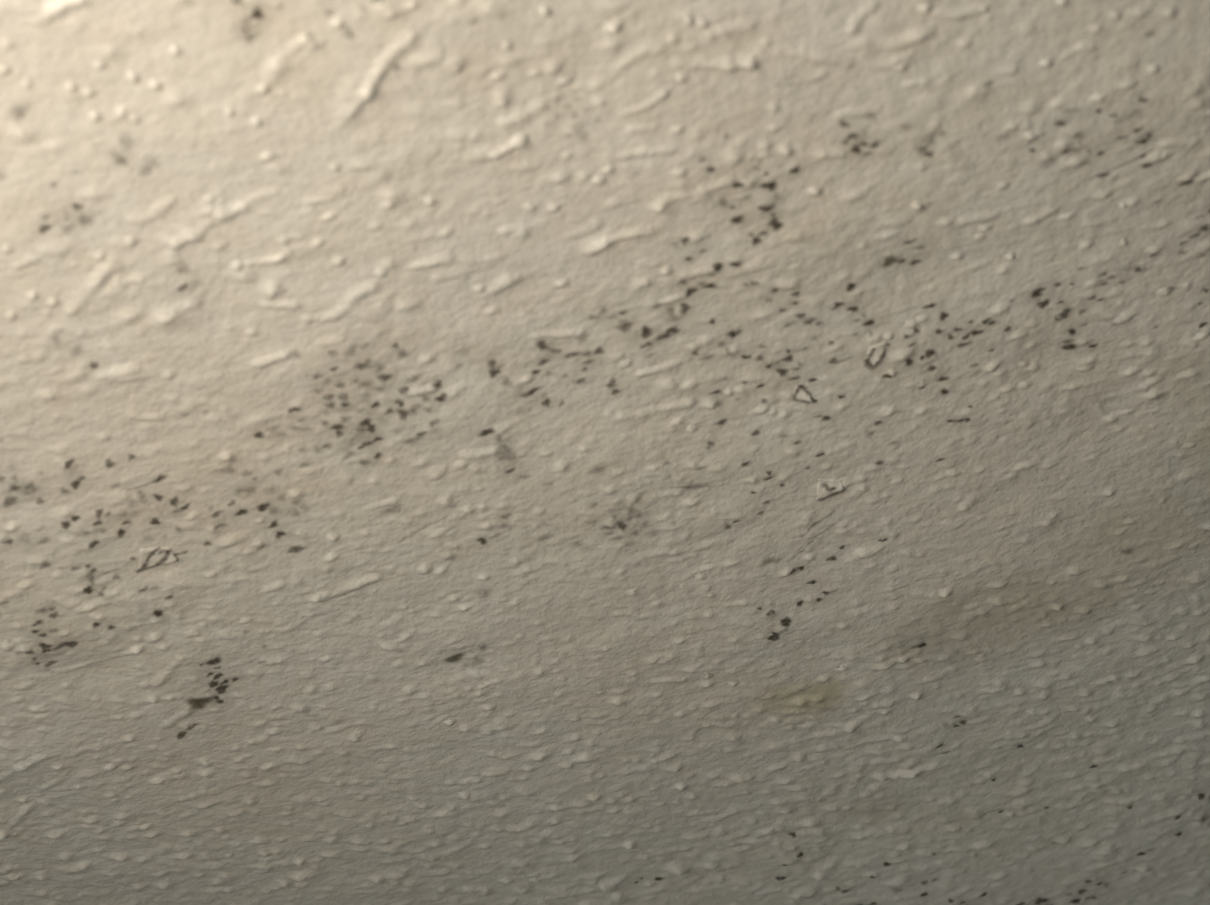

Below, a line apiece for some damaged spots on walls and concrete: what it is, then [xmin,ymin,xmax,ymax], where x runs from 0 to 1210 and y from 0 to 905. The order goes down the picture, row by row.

leakage [751,206,782,245]
leakage [681,263,739,312]
leakage [620,312,678,348]
leakage [923,304,1010,347]
leakage [1032,283,1097,350]
leakage [524,342,601,405]
leakage [905,328,948,394]
leakage [359,388,407,464]
leakage [230,504,284,537]
leakage [26,614,76,666]
leakage [758,608,790,641]
leakage [189,658,237,708]